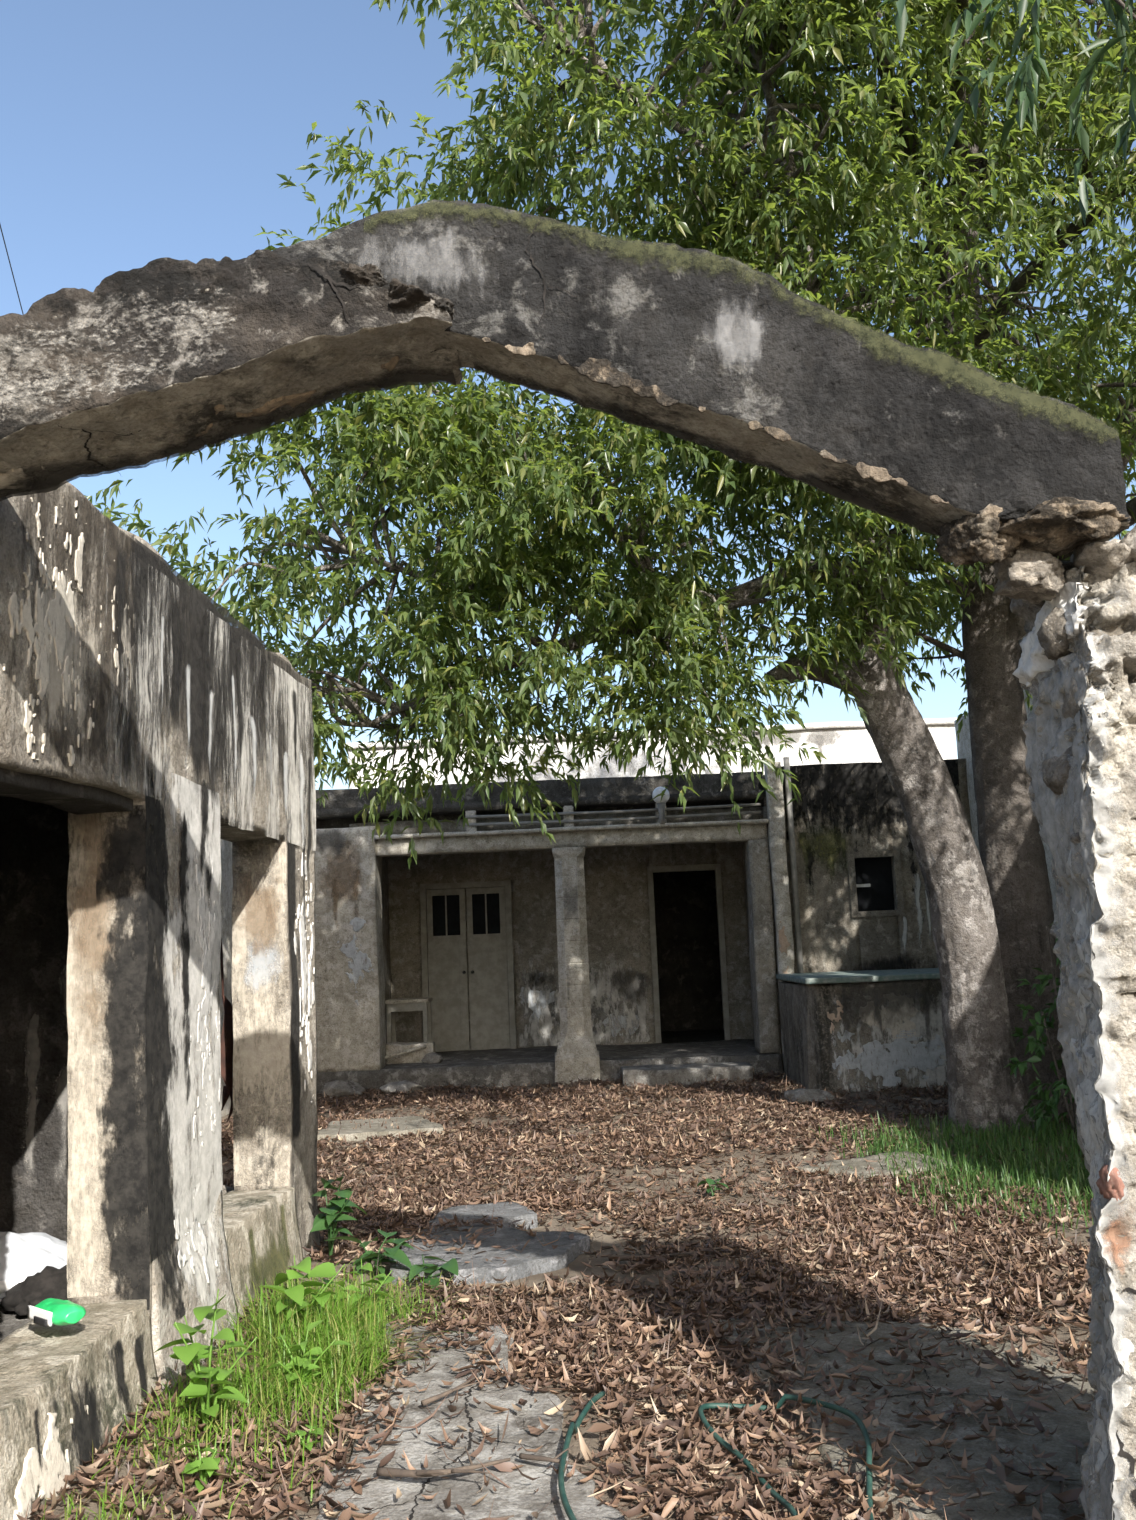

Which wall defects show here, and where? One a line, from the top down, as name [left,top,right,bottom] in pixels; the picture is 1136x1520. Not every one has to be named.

spalling [482,337,536,357]
water stain [474,365,942,537]
spalling [819,450,908,487]
peeling [0,461,132,766]
peeling [1013,582,1136,808]
water stain [0,369,456,1334]
water stain [709,730,931,948]
water stain [944,759,961,802]
rust [1104,1221,1131,1270]
peeling [13,1405,89,1520]
crack [366,1365,559,1520]
crack [1116,1430,1136,1499]